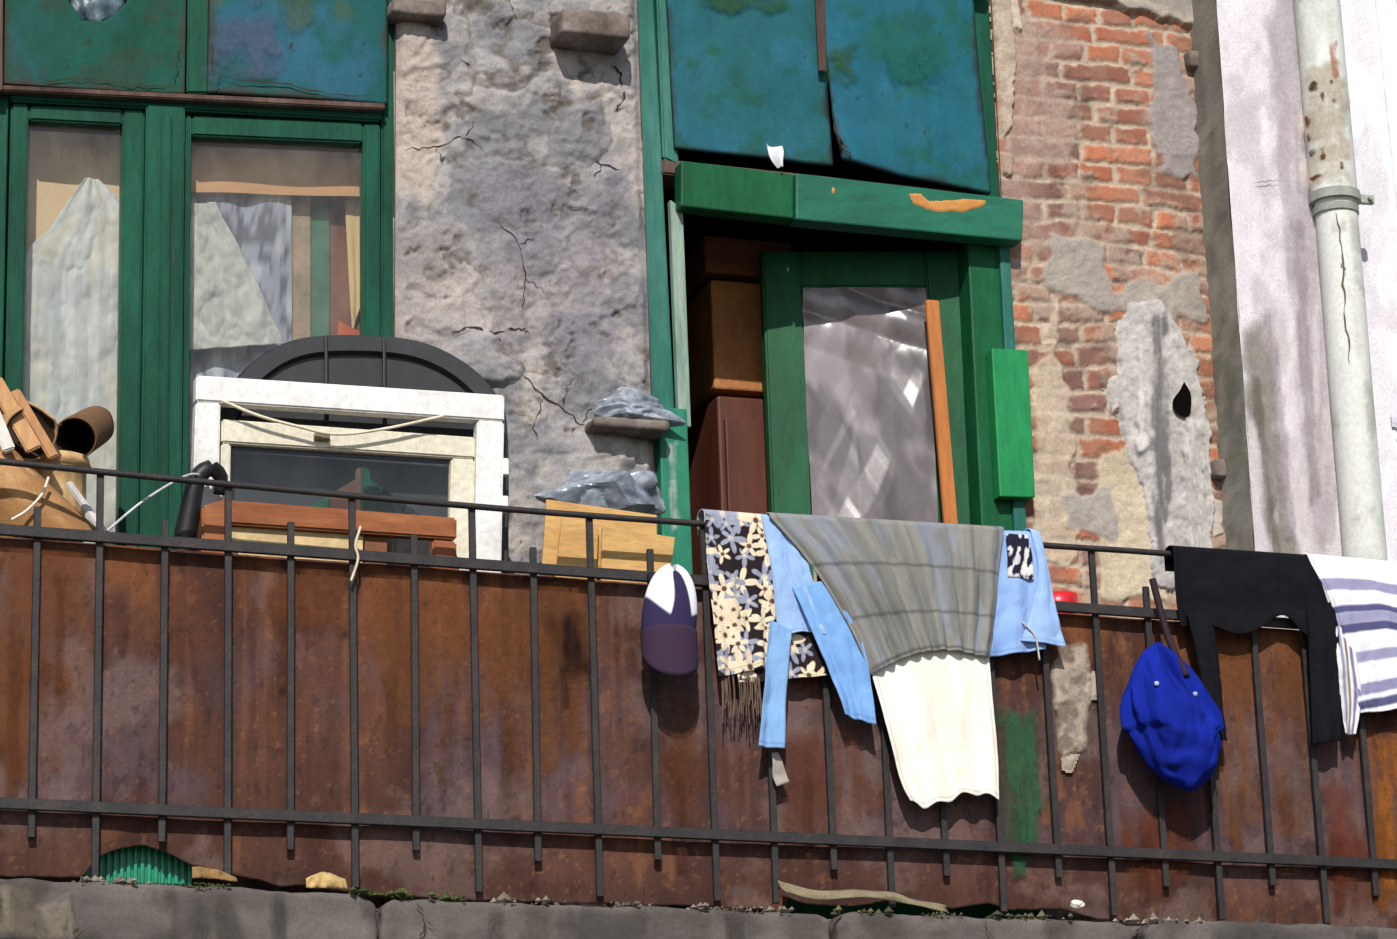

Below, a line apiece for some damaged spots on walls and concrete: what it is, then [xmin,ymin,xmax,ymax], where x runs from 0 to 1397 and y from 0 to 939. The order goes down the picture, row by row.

flaking render [989,0,1024,178]
flaking render [1103,299,1224,593]
rust [0,537,1397,929]